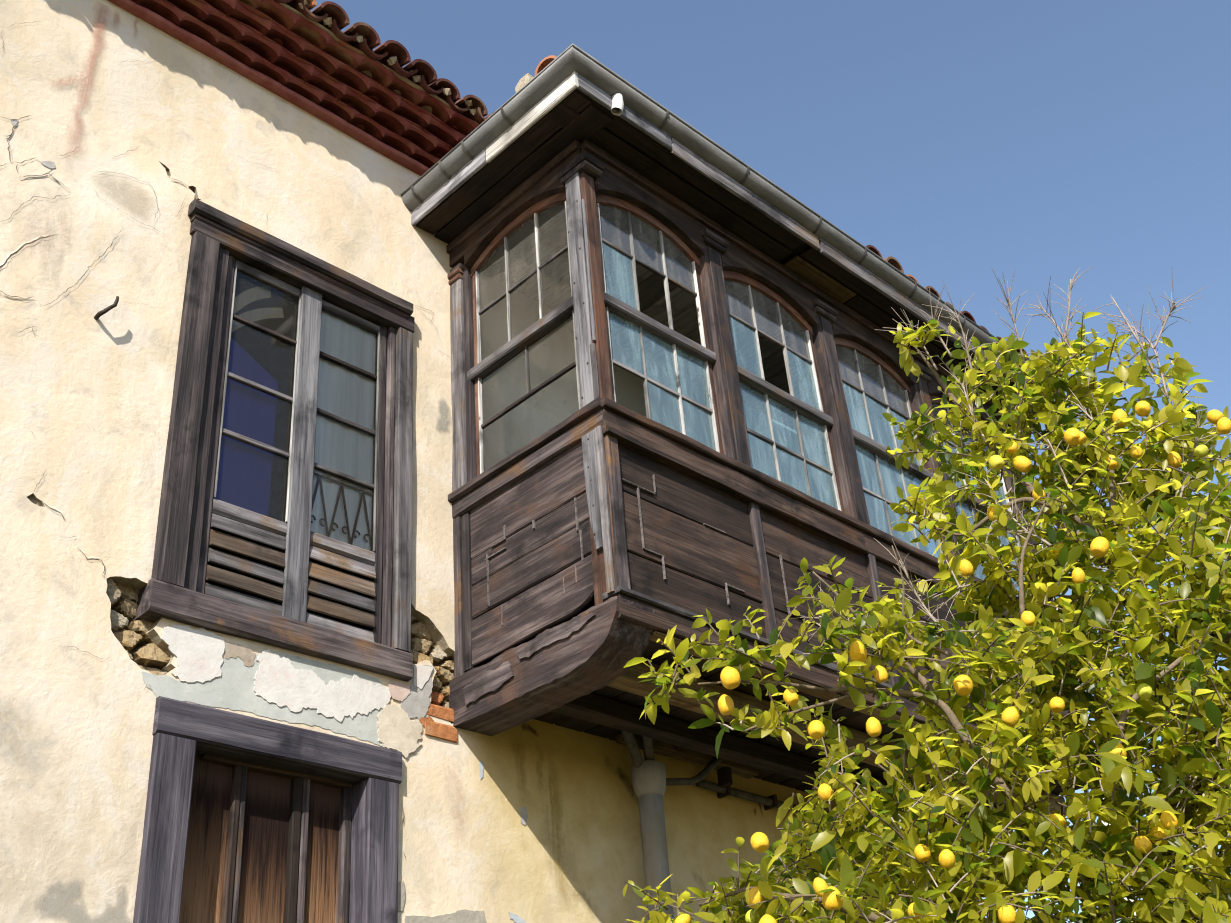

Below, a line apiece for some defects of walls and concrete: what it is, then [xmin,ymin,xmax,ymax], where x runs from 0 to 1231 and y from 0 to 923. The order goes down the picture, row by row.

crack [0,115,189,338]
crack [33,472,108,579]
flaking render [106,576,458,745]
flaking render [40,883,129,923]